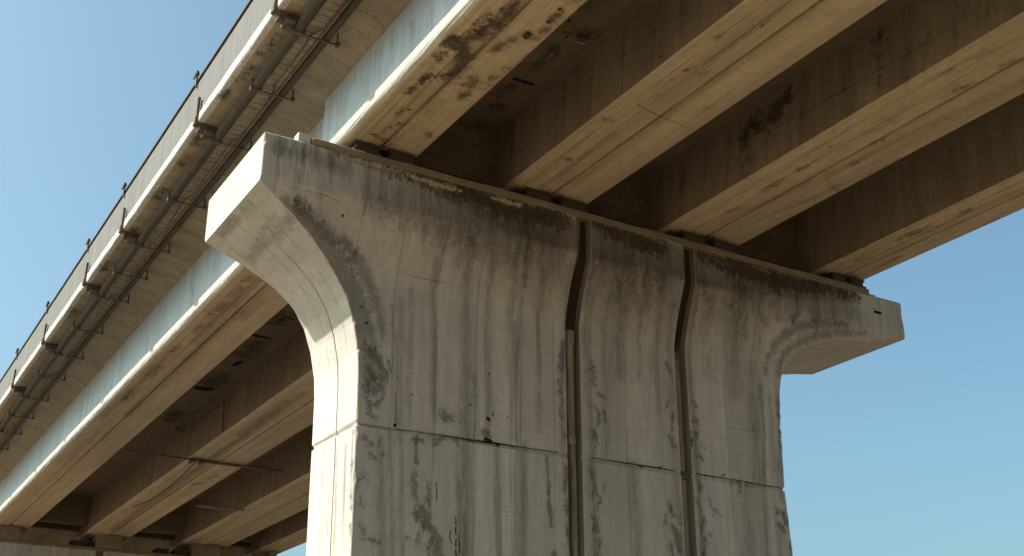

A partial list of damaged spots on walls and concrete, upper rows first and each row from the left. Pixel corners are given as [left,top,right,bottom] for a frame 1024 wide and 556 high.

damp [333,143,576,235]